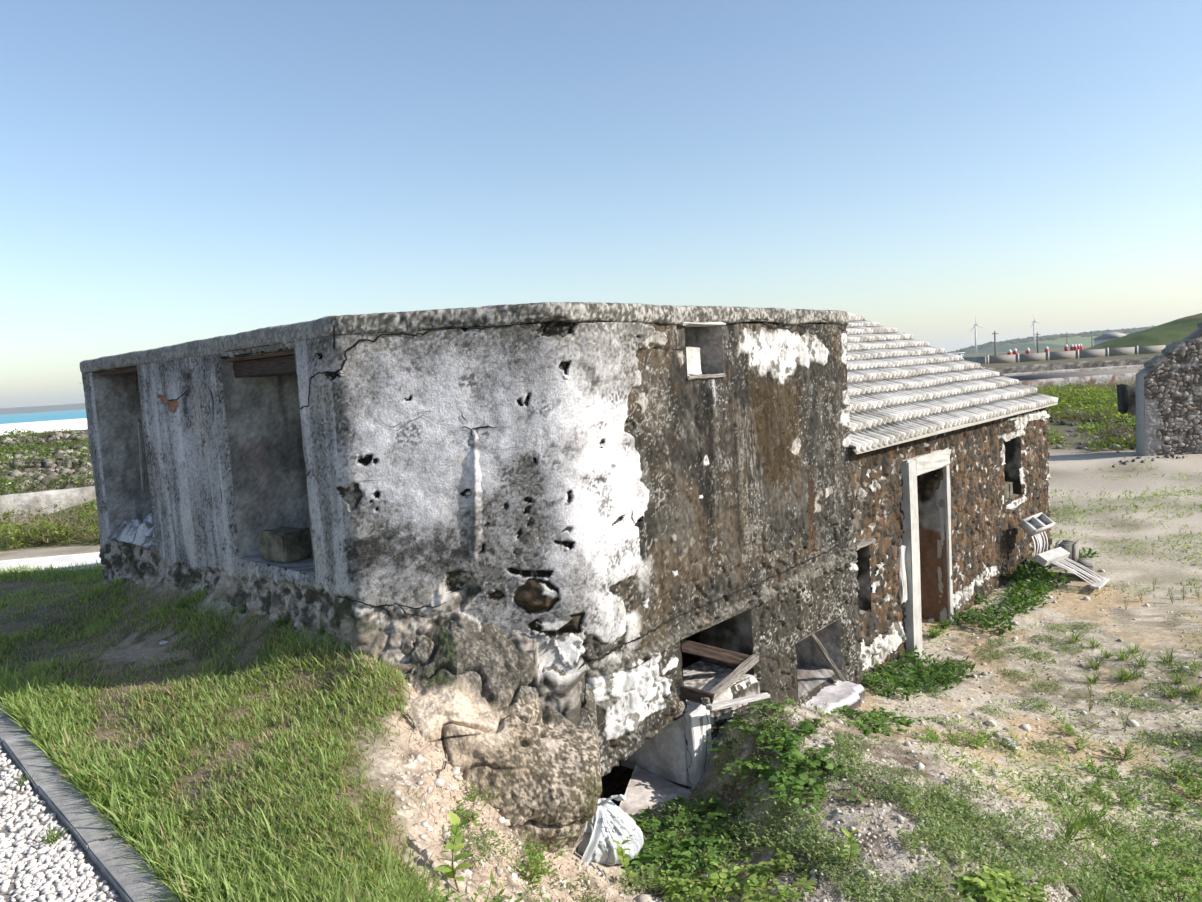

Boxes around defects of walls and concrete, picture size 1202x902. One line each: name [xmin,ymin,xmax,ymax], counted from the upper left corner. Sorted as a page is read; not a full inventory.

crack [300,317,535,409]
flaking render [736,326,847,385]
damp [694,383,716,528]
damp [737,371,801,554]
flaking render [790,435,806,466]
flaking render [813,486,833,514]
flaking render [839,390,852,449]
crack [335,596,446,618]
spalling [442,569,475,593]
spalling [485,497,586,669]
crack [579,537,853,669]
flaking render [585,652,679,741]